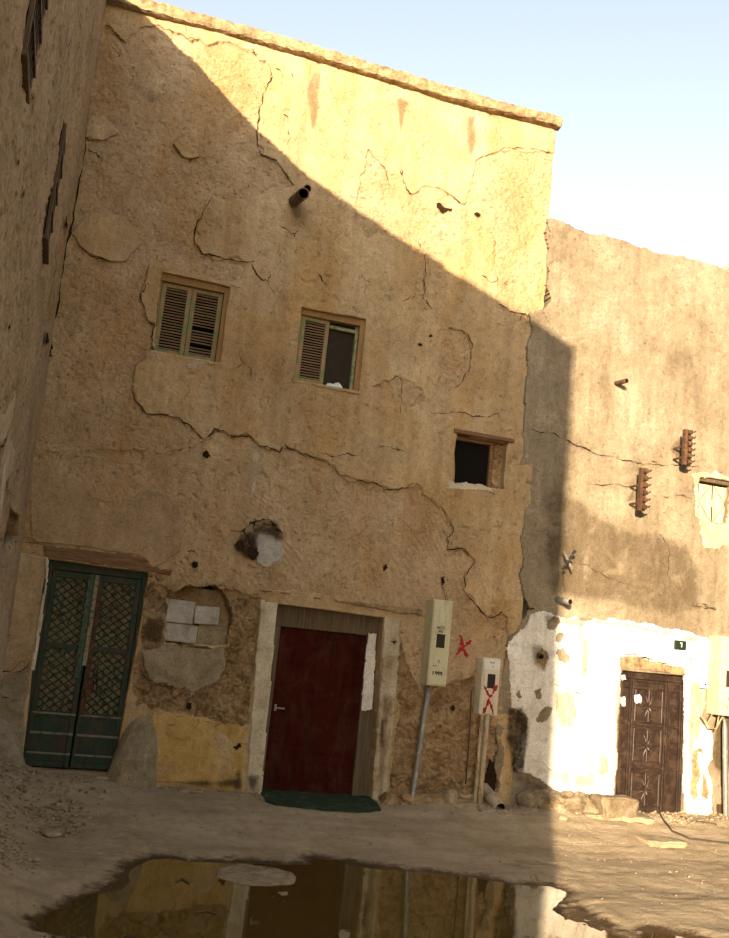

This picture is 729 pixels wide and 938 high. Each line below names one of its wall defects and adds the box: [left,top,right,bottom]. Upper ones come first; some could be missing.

crack [228,41,294,185]
spalling [33,26,506,795]
crack [130,266,508,639]
peeling [535,689,552,722]
peeling [536,616,569,669]
spalling [690,748,708,799]